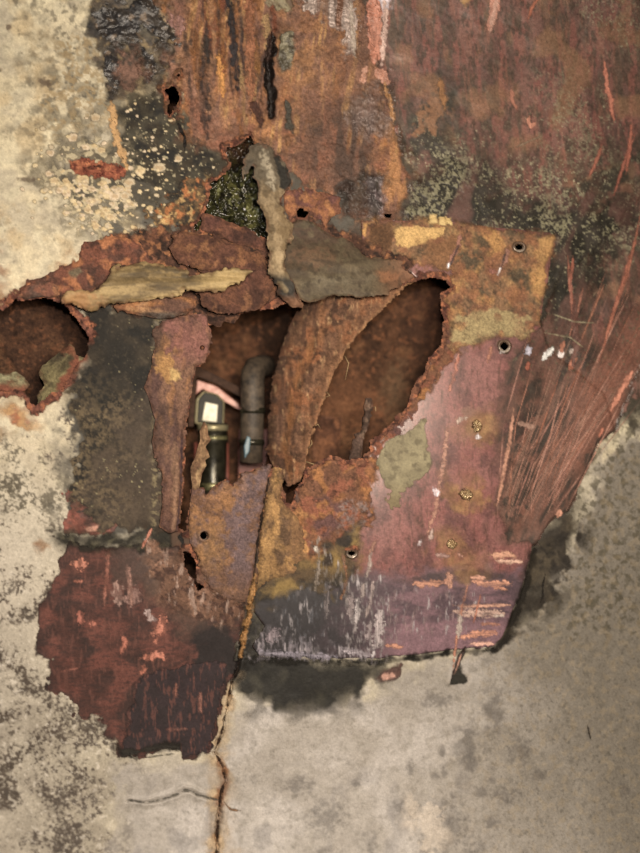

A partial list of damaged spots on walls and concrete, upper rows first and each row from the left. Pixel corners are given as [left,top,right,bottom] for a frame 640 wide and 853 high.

corrosion [69,100,129,180]
corrosion [0,372,30,392]
corrosion [2,404,32,430]
corrosion [36,344,84,404]
corrosion [15,177,280,327]
peeling [60,261,253,312]
peeling [241,143,304,308]
corrosion [145,0,555,658]
peeling [376,418,432,509]
crack [253,478,269,582]
corrosion [209,685,234,814]
corrosion [207,830,224,853]